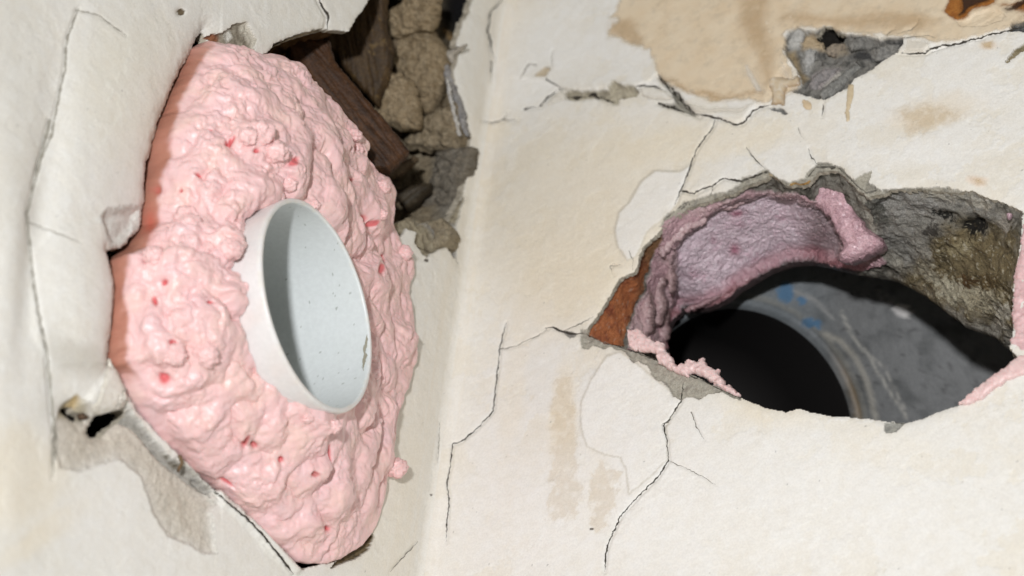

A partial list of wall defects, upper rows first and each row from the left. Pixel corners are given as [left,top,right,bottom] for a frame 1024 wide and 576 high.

peeling [204,21,337,58]
spalling [391,128,466,265]
spalling [435,0,467,50]
crack [485,57,613,123]
crack [636,75,771,205]
leakage [608,0,1024,112]
spalling [769,27,905,115]
crack [887,19,1020,55]
spalling [564,162,1024,401]
spalling [51,358,218,556]
crack [438,319,589,540]
crack [604,382,716,572]